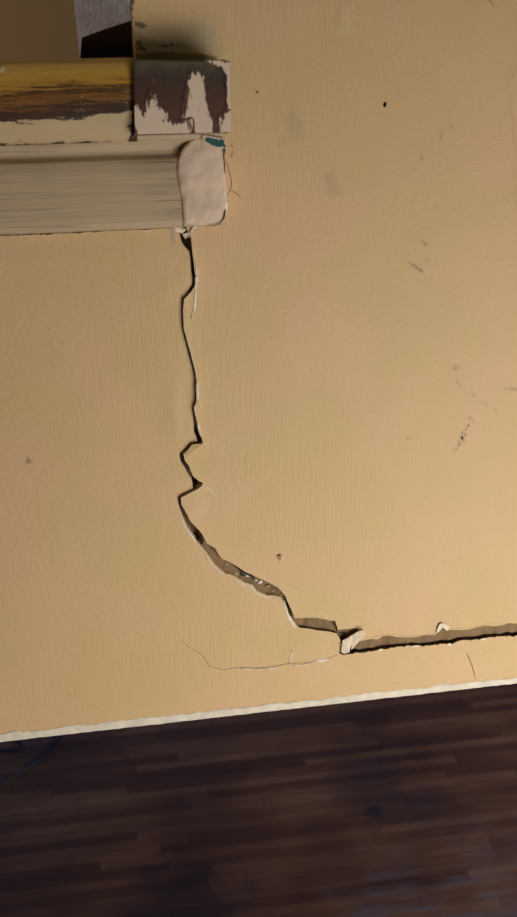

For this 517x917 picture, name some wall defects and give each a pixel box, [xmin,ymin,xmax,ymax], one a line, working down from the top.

peeling [0,59,231,145]
crack [174,137,517,680]